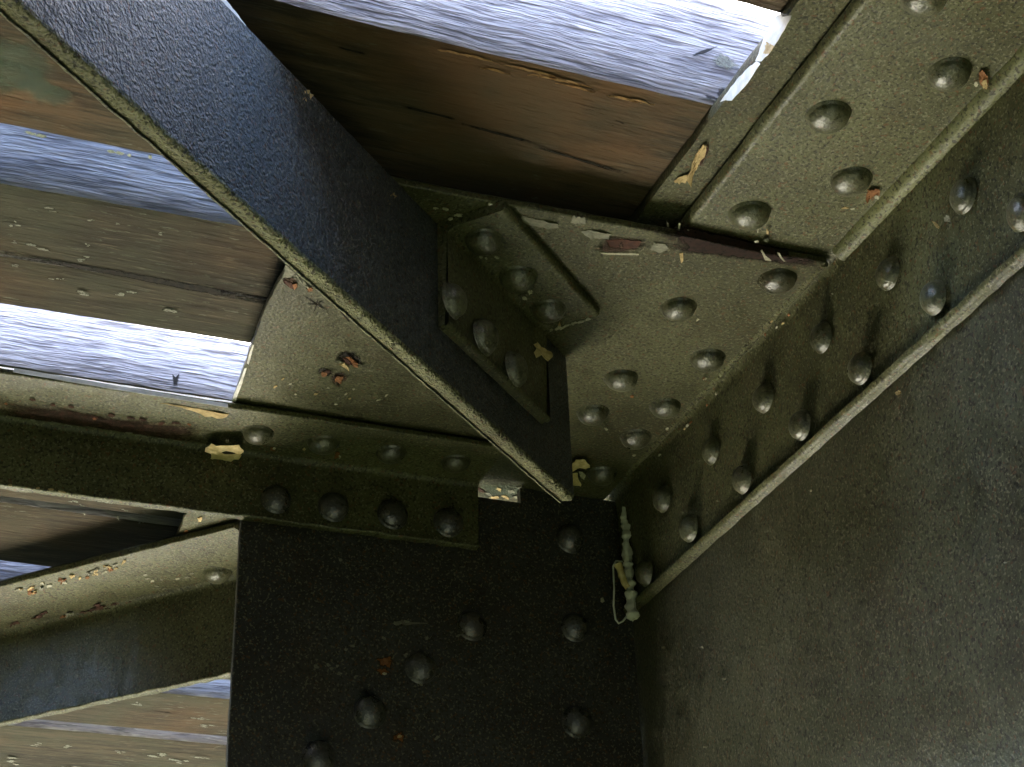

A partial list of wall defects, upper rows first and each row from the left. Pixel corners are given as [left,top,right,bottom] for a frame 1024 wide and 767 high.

peeling [674,144,708,186]
peeling [521,215,683,263]
peeling [534,342,553,361]
rust [318,352,364,385]
rust [4,398,201,443]
peeling [205,443,244,462]
peeling [572,459,590,487]